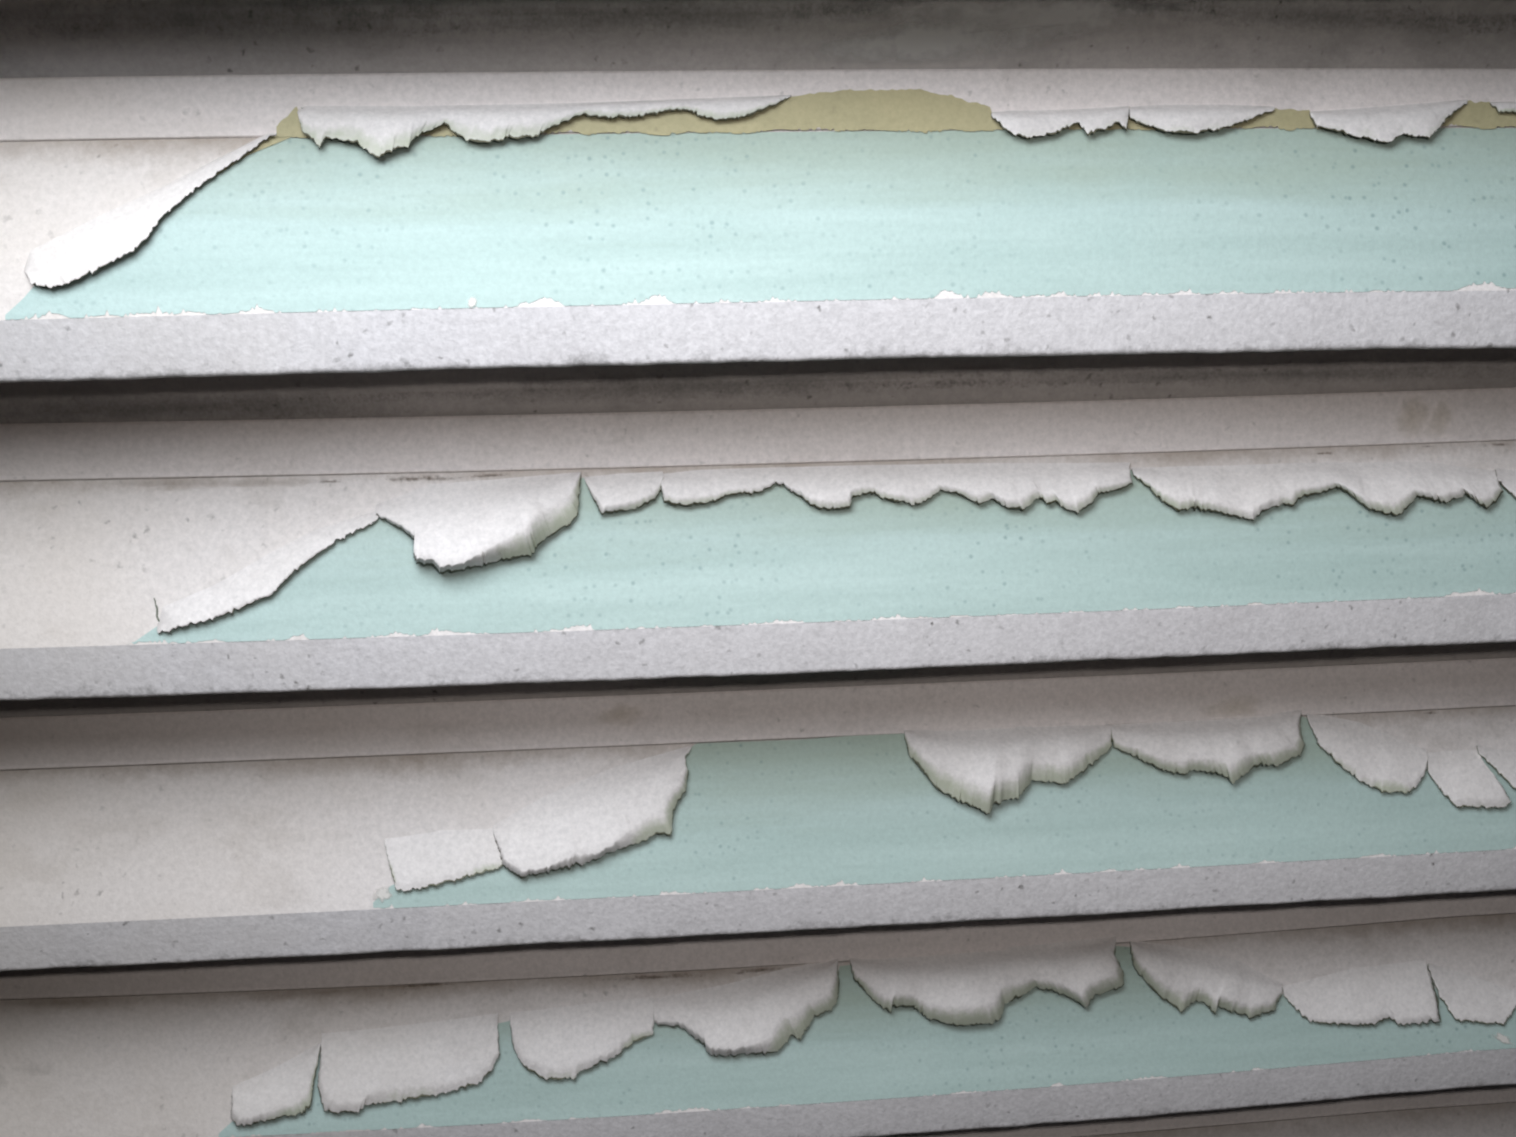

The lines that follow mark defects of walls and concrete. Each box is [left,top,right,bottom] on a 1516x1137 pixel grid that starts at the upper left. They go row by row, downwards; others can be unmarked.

peeling [5,89,1516,320]
peeling [132,462,1516,644]
peeling [373,710,1516,908]
peeling [219,936,1516,1137]